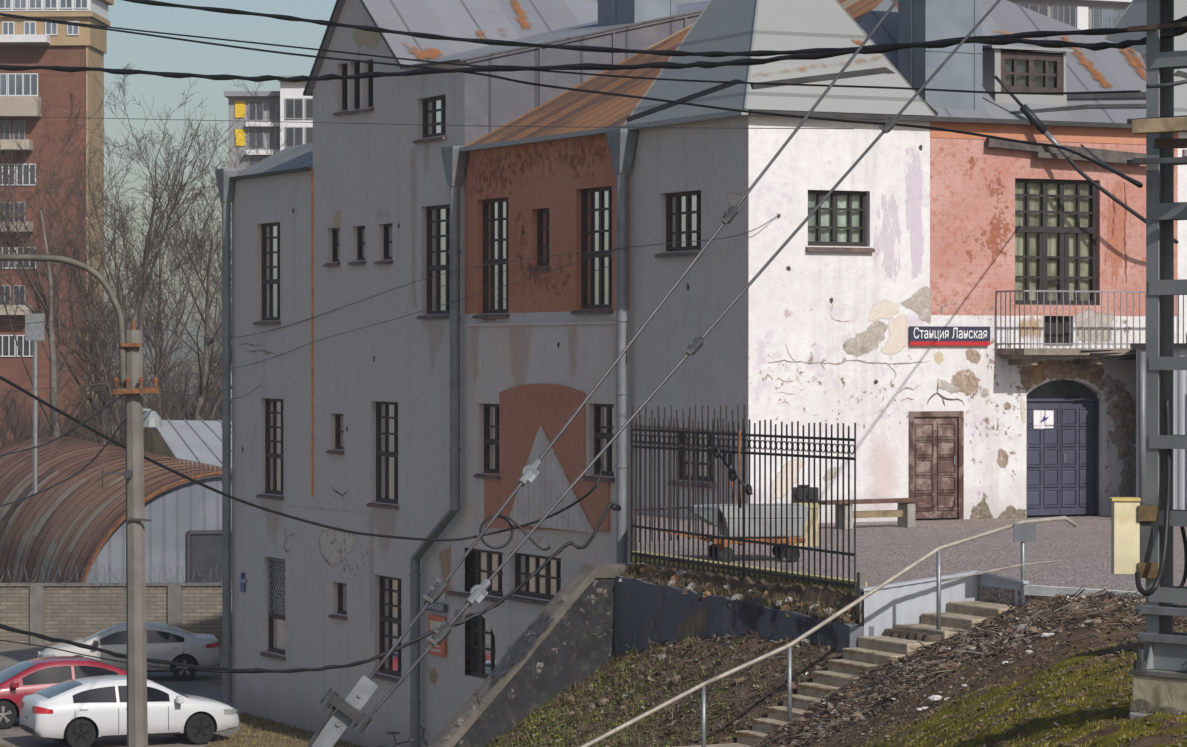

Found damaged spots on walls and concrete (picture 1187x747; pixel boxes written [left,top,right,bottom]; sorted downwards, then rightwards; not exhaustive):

rust [511,0,531,30]
rust [404,43,441,59]
rust [1061,36,1113,87]
rust [1120,48,1146,79]
flaking render [967,173,1011,275]
peeling [1107,182,1127,287]
flaking render [750,145,993,440]
flaking render [1074,309,1135,343]
crack [769,344,965,406]
flaking render [937,337,1136,506]
flaking render [772,458,802,499]
flaking render [970,481,1027,519]